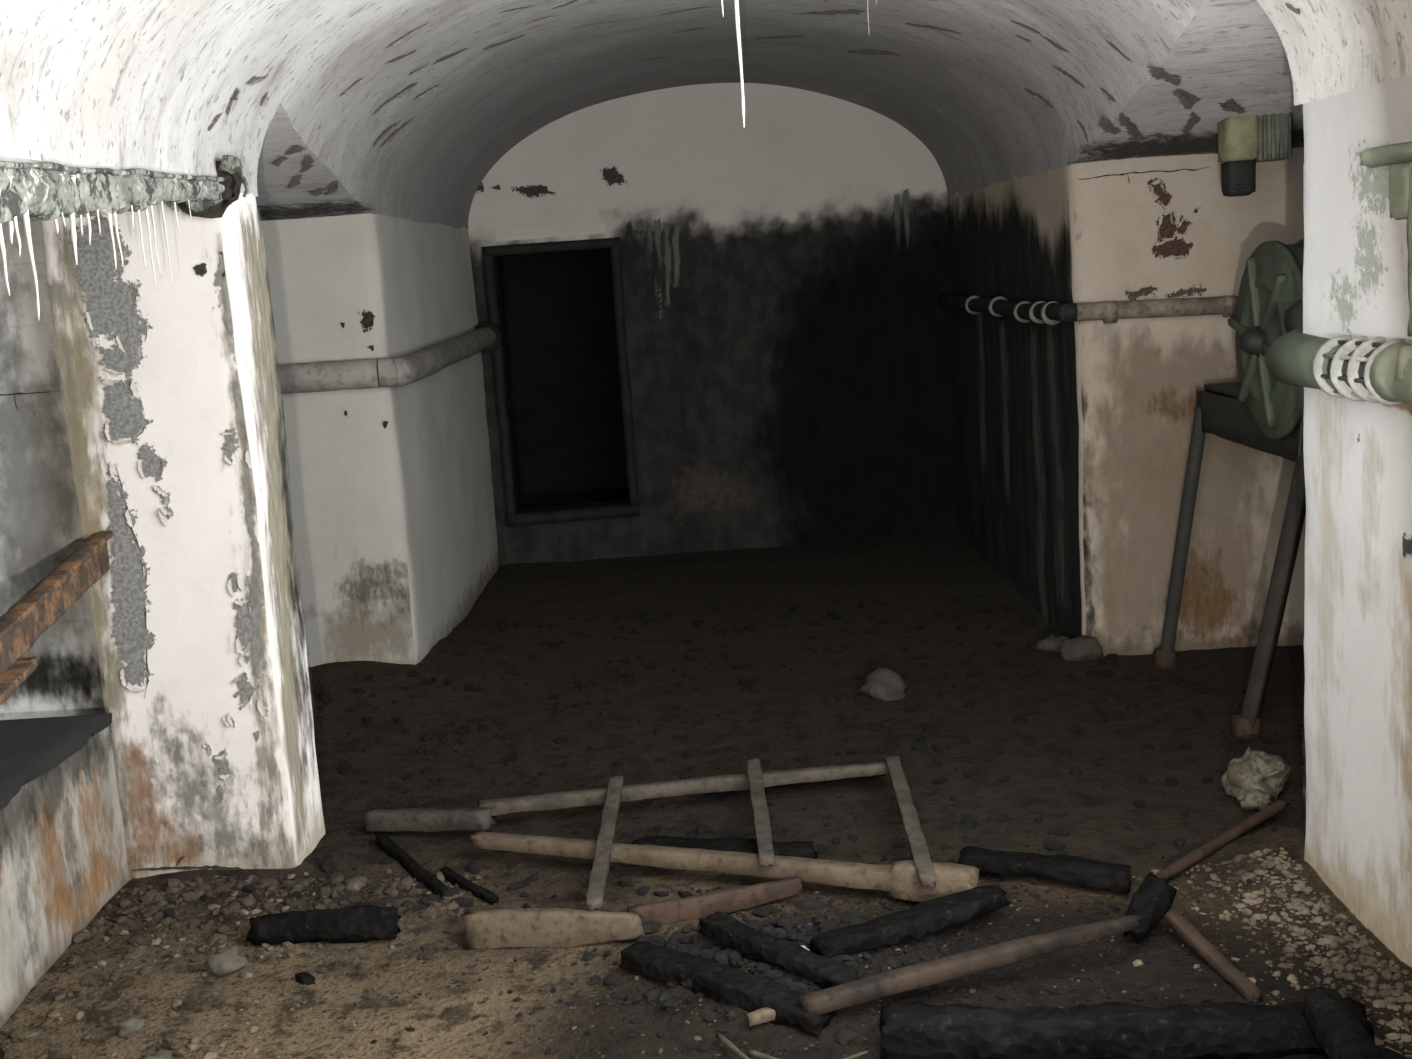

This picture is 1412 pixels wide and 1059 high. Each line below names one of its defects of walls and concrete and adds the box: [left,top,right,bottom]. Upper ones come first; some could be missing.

damp [0,227,114,598]
peeling [68,215,173,526]
peeling [208,76,269,131]
damp [470,244,489,324]
peeling [476,182,556,198]
peeling [600,164,627,186]
damp [481,189,1095,639]
peeling [1147,178,1203,260]
peeling [106,462,155,692]
damp [161,202,373,869]
damp [0,571,133,859]
damp [1339,866,1412,959]